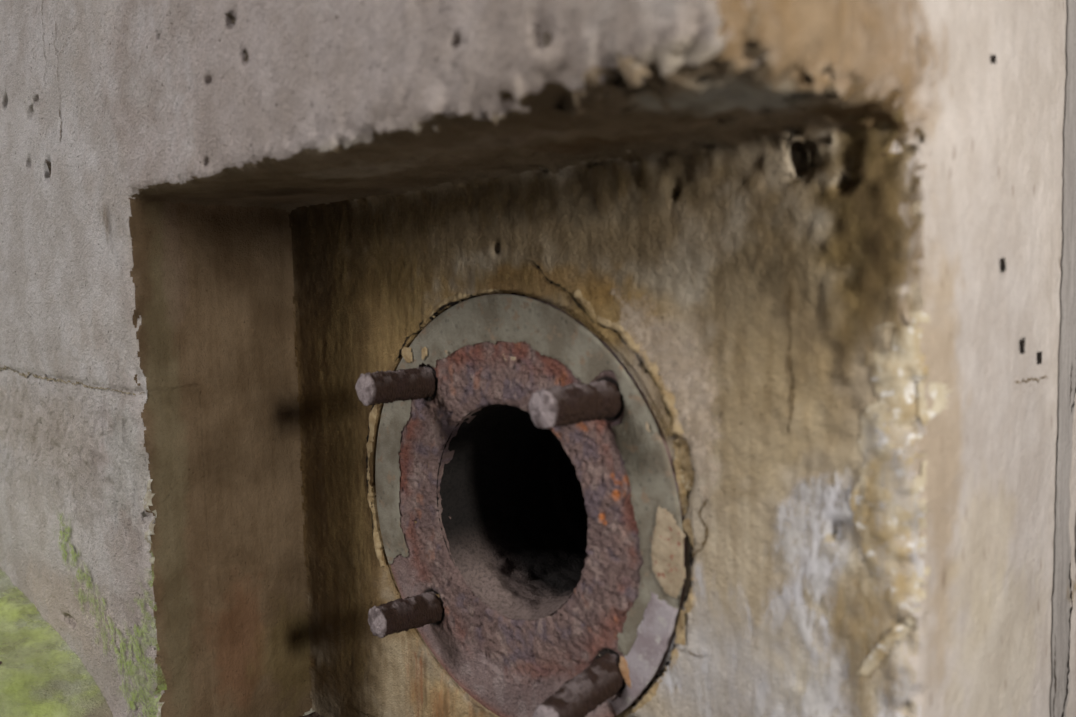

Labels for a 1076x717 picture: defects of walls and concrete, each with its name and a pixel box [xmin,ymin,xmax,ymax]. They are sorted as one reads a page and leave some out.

crack [1015,367,1076,408]
water stain [756,472,858,717]
water stain [664,666,680,693]